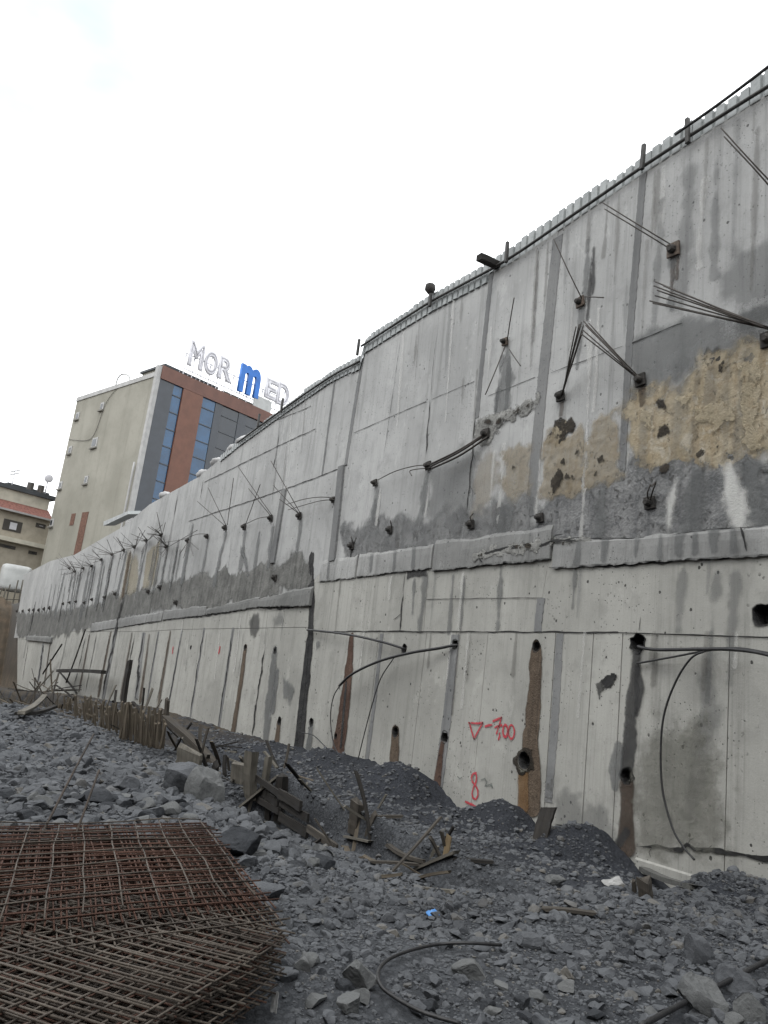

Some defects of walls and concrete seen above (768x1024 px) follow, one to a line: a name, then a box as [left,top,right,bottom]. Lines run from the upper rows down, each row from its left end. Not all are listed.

damp [631,308,768,399]
spalling [474,392,540,447]
spalling [502,340,768,502]
damp [16,523,312,658]
spalling [472,536,591,562]
damp [340,452,768,562]
corrosion [231,645,247,732]
corrosion [332,633,353,754]
corrosion [434,741,444,786]
corrosion [518,647,542,817]
spalling [596,673,617,699]
damp [609,651,644,857]